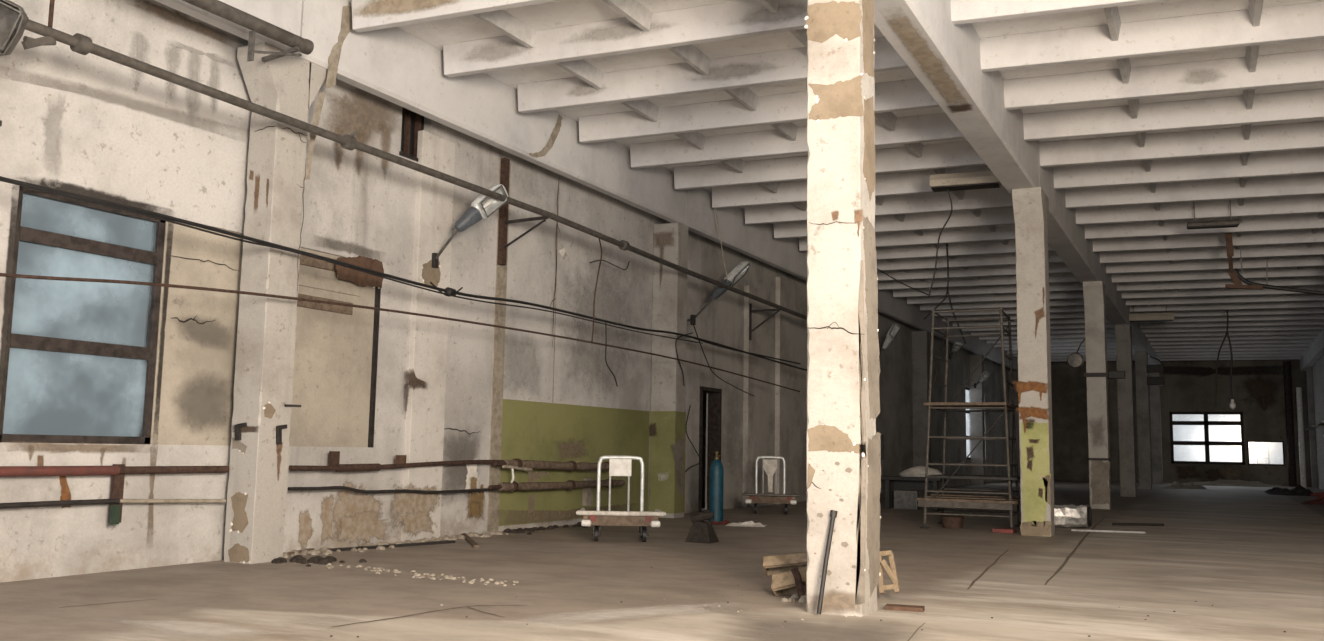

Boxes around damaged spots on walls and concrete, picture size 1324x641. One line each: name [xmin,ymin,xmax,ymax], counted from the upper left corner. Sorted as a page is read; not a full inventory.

damp [335,94,390,174]
peeling [804,0,875,200]
damp [182,382,223,425]
peeling [807,216,881,605]
peeling [228,492,250,564]